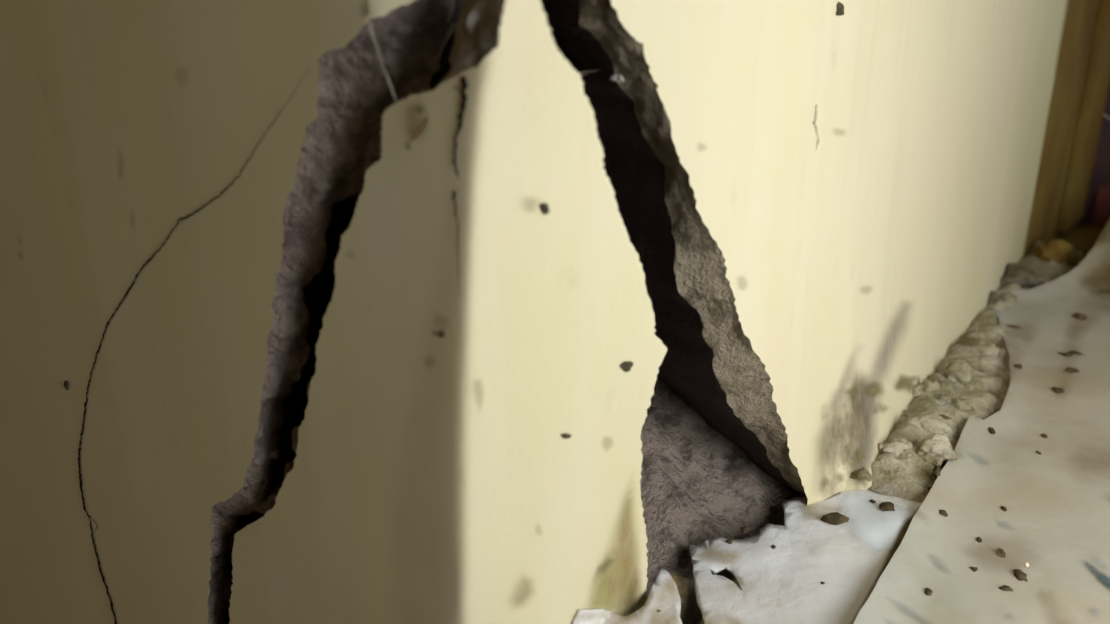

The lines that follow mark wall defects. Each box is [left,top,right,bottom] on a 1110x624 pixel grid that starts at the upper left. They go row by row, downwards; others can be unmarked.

crack [78,0,506,624]
crack [541,0,806,496]